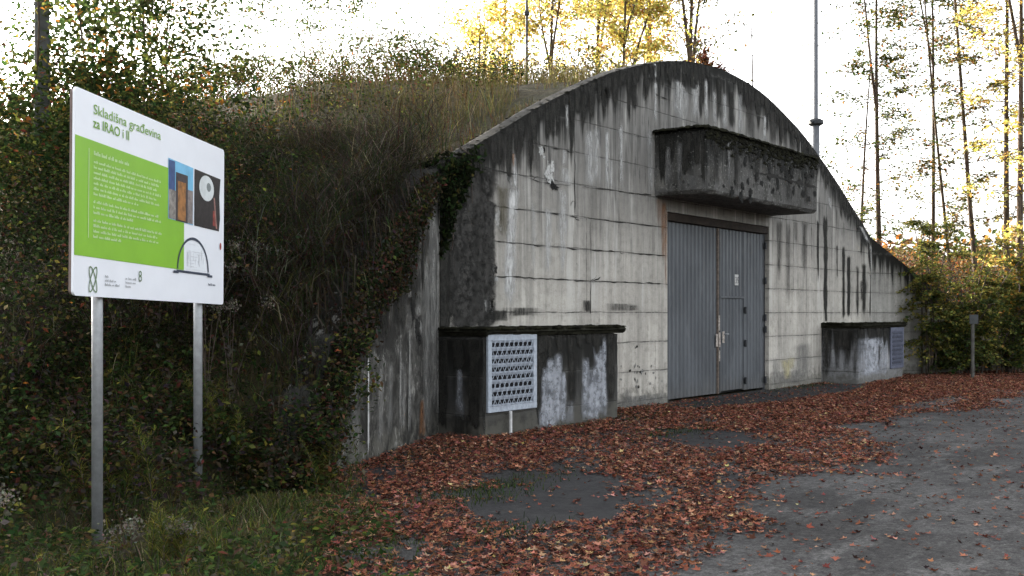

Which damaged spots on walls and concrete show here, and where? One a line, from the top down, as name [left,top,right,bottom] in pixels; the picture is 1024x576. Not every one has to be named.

leakage [631,64,657,116]
leakage [588,134,608,180]
leakage [659,131,739,187]
leakage [358,130,537,446]
leakage [803,217,886,374]
leakage [537,333,615,427]